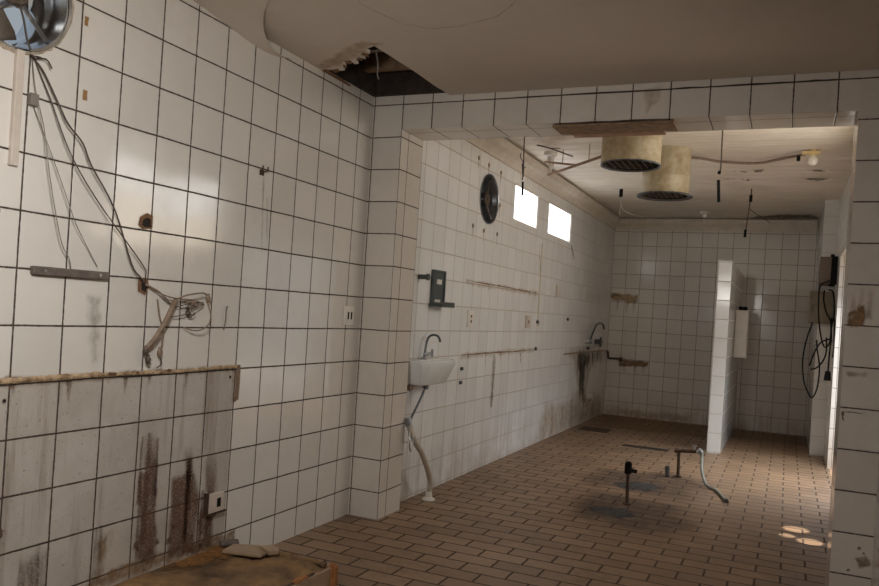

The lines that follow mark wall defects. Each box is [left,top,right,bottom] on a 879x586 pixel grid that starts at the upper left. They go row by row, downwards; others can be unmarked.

peeling [322,49,370,86]
leakage [578,353,593,390]
leakage [182,460,192,552]